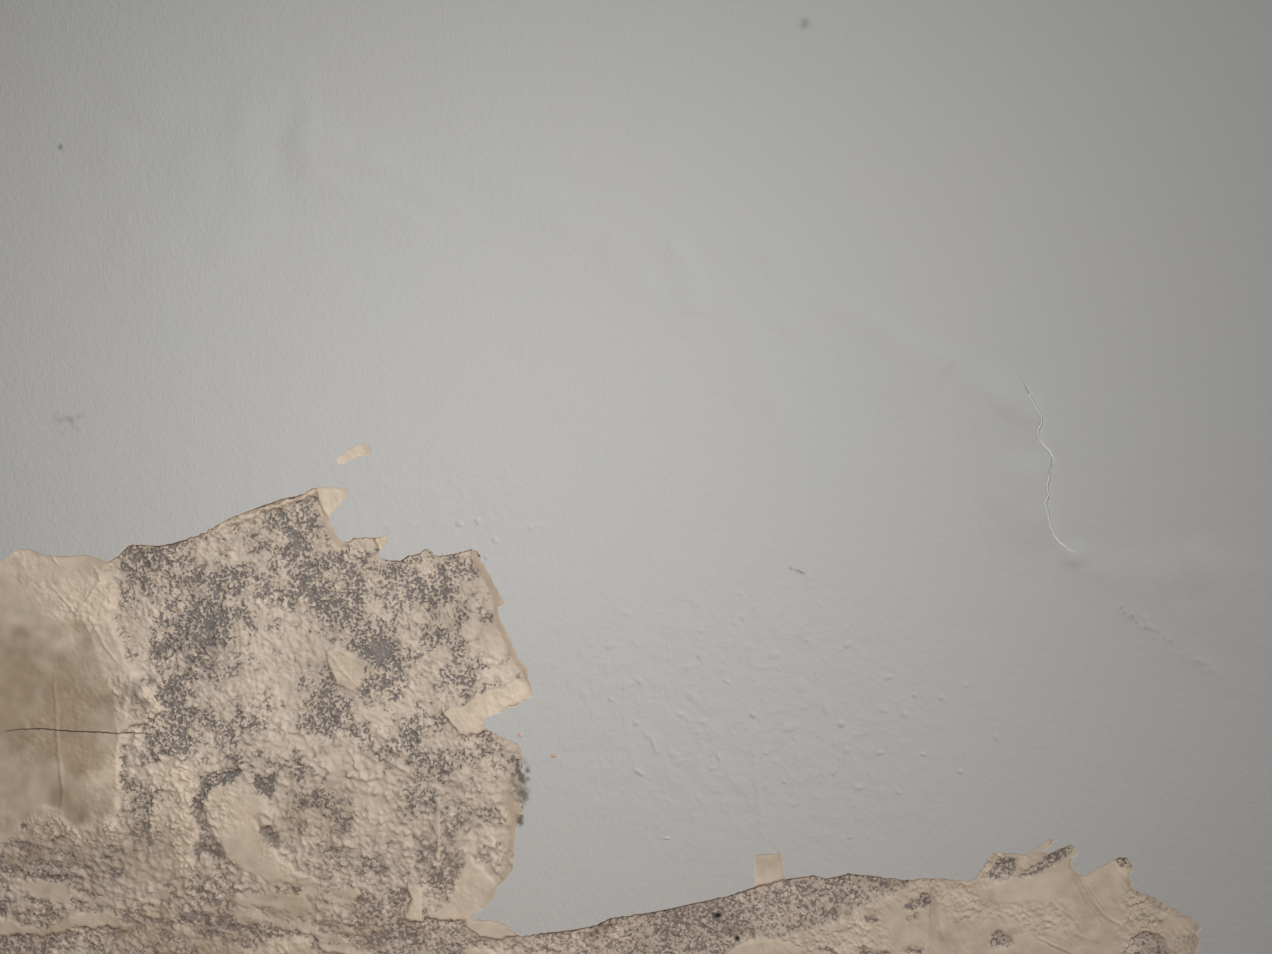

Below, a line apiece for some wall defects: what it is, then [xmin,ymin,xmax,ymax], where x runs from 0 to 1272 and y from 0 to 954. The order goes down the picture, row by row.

peeling [0,487,1202,954]